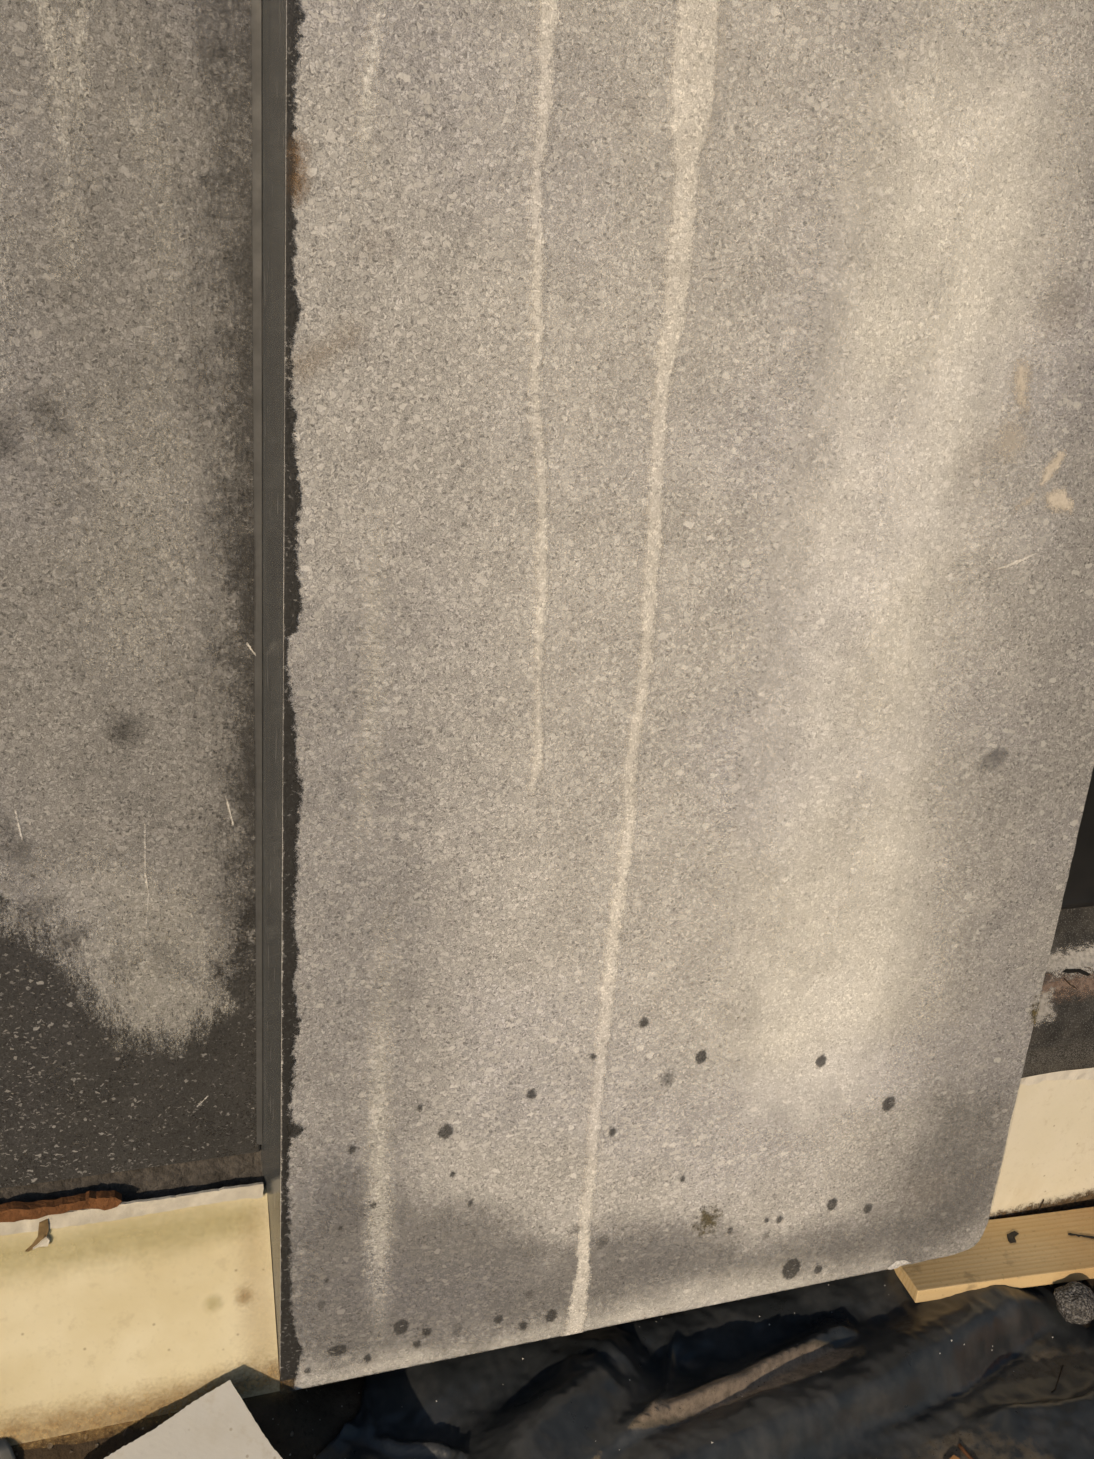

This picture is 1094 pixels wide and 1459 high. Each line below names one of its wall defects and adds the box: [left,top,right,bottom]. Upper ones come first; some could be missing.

water stain [0,0,259,1189]
water stain [280,0,990,1394]
water stain [746,61,1040,1120]